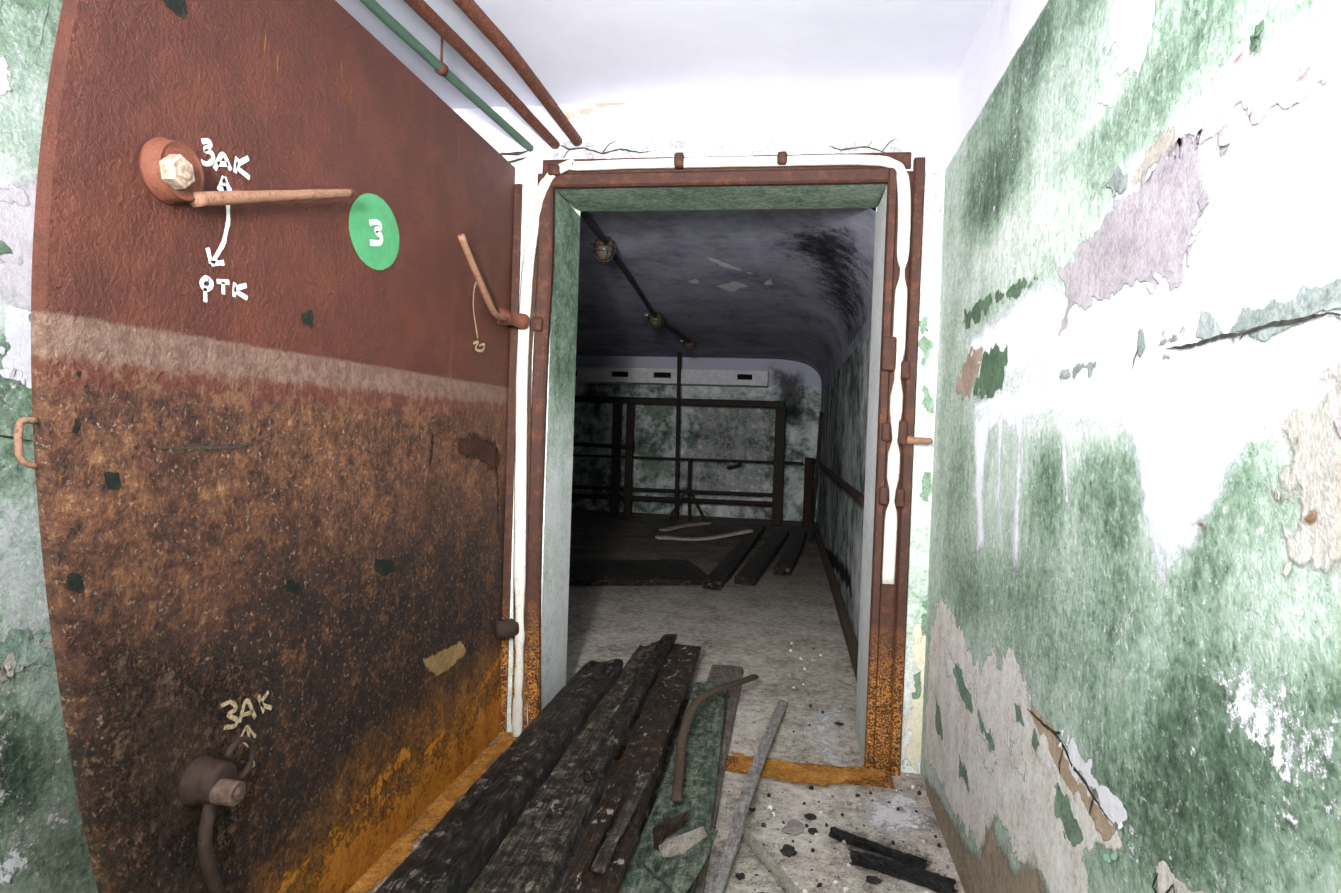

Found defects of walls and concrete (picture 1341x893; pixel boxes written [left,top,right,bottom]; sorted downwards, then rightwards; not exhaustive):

peeling [0,50,34,99]
flaking render [1058,19,1329,336]
flaking render [0,177,37,421]
peeling [918,316,934,366]
peeling [962,276,1038,329]
crack [1131,312,1341,373]
spalling [1137,277,1341,359]
crack [0,434,34,442]
peeling [920,471,932,502]
peeling [1264,361,1341,576]
corrosion [731,752,887,786]
peeling [902,598,1240,893]